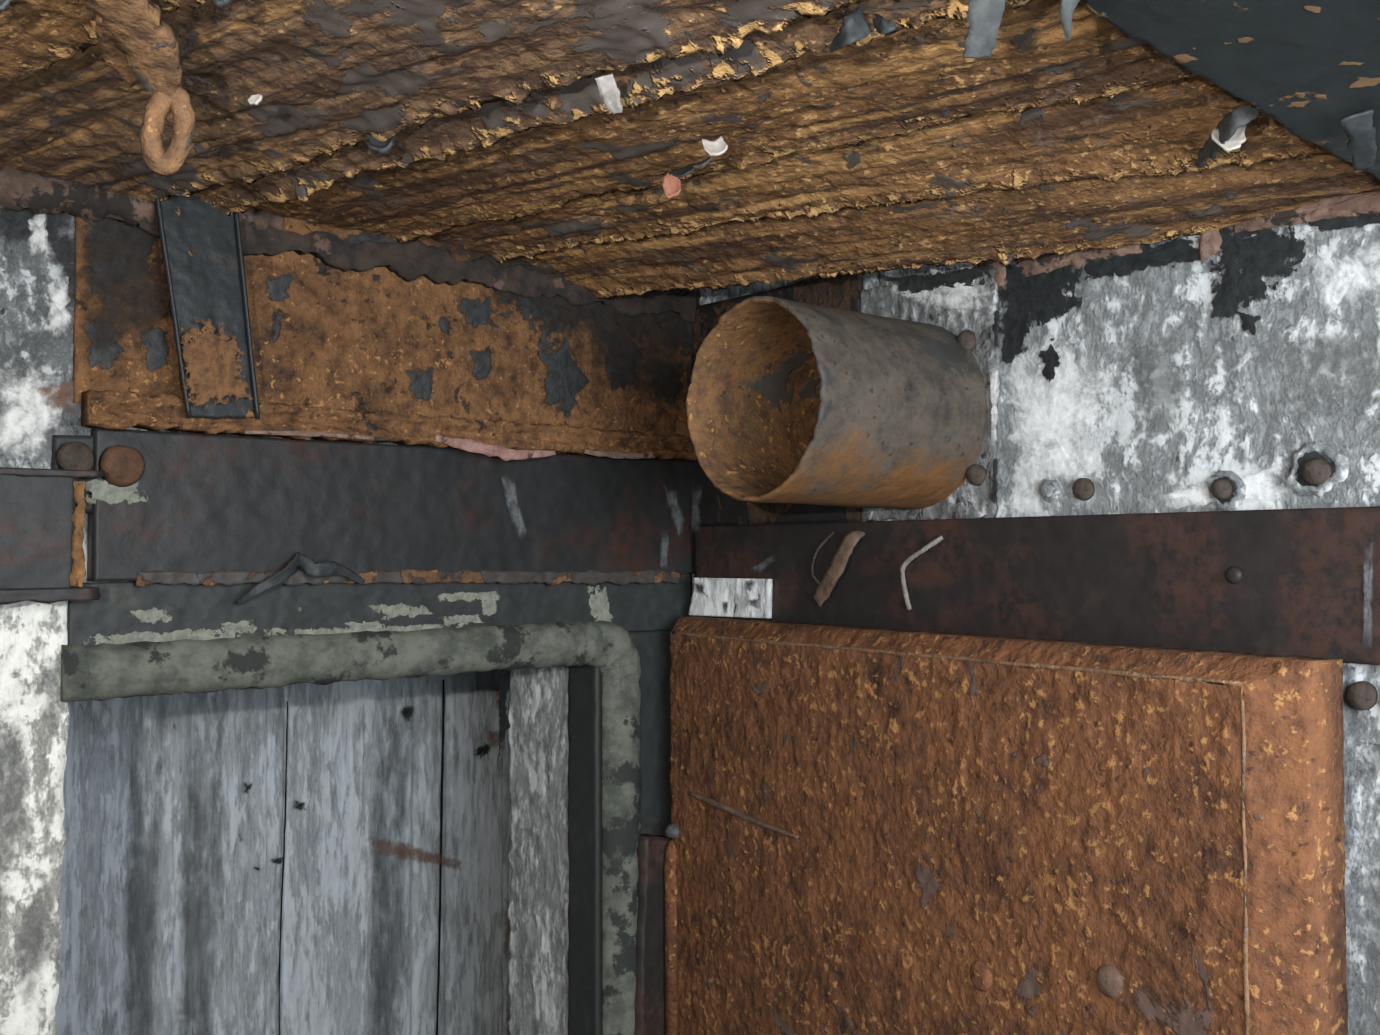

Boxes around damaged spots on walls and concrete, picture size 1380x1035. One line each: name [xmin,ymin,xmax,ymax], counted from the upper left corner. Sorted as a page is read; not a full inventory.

peeling [963,0,1006,59]
peeling [248,94,263,105]
peeling [595,73,623,114]
peeling [663,136,728,199]
peeling [1195,105,1259,168]
peeling [884,214,1380,382]
rust [180,318,253,411]
peeling [458,289,693,418]
peeling [84,552,501,645]
rust [134,569,680,587]
peeling [587,585,613,622]
peeling [475,670,510,759]